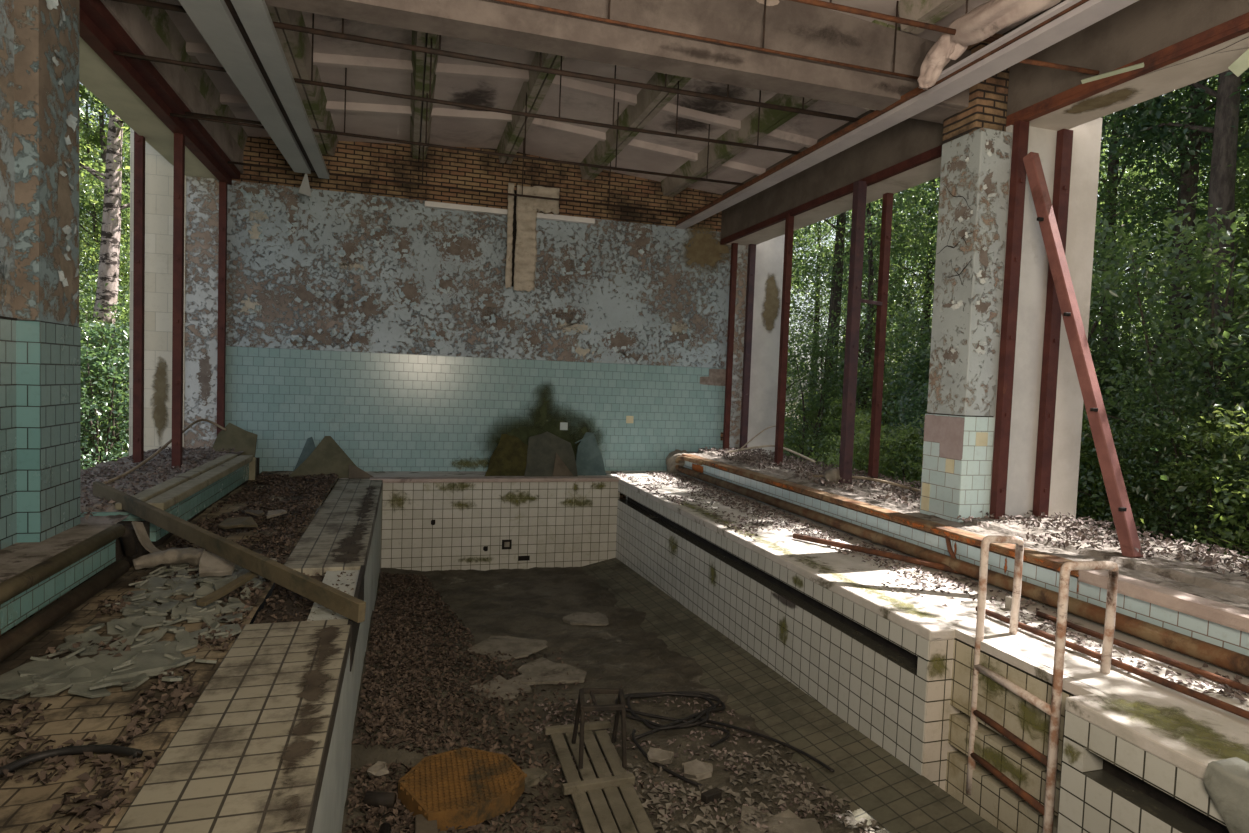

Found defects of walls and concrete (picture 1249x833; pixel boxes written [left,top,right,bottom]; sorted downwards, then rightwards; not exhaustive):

peeling [46,0,66,27]
leakage [454,90,493,112]
peeling [56,111,82,302]
peeling [230,185,301,245]
peeling [951,204,973,245]
peeling [982,173,996,200]
peeling [284,197,488,351]
peeling [473,288,651,364]
leakage [762,275,780,331]
peeling [941,245,994,314]
leakage [152,359,169,438]
peeling [195,349,213,406]